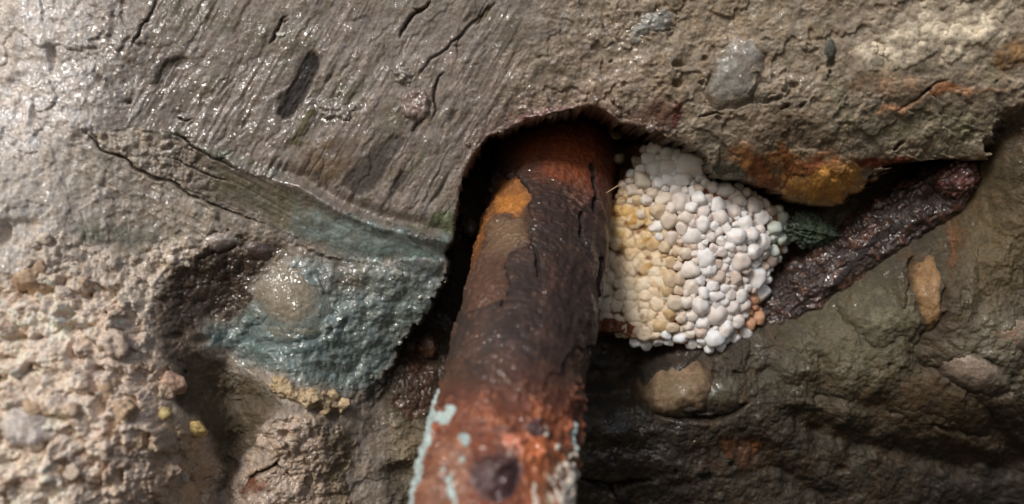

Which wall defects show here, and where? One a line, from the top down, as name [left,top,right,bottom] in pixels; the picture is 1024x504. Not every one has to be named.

rust [876,103,910,114]
crack [85,118,266,224]
spalling [453,95,678,231]
rust [730,142,978,326]
rust [390,331,435,417]
peeling [458,433,471,462]
rust [469,418,546,502]
spalling [531,318,1024,504]